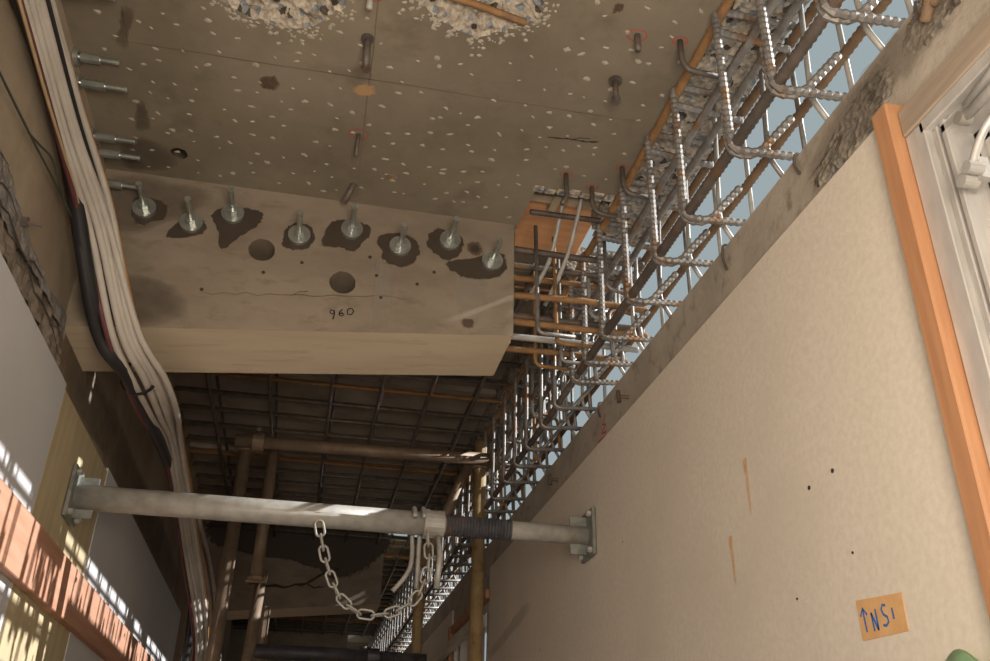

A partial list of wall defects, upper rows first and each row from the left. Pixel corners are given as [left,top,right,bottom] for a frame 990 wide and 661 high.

spalling [201,0,370,62]